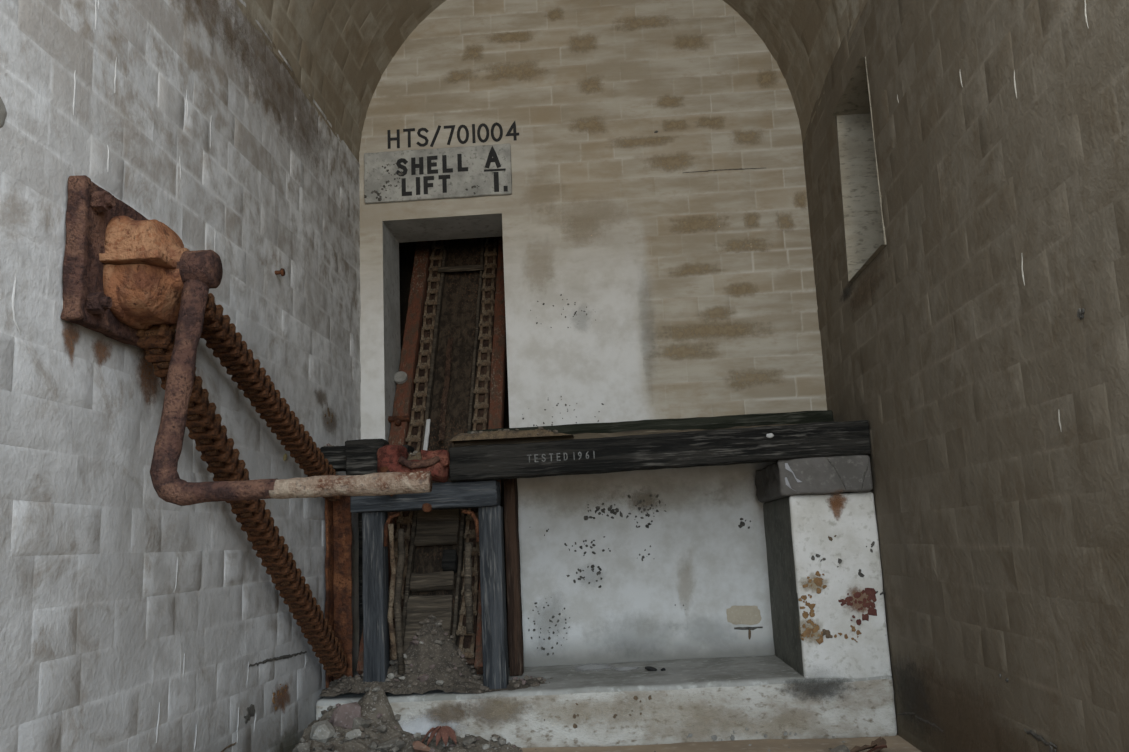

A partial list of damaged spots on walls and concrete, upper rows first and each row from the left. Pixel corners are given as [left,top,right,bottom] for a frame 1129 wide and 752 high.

rust [63,324,79,360]
rust [94,340,110,364]
rust [139,349,158,402]
rust [829,491,846,517]